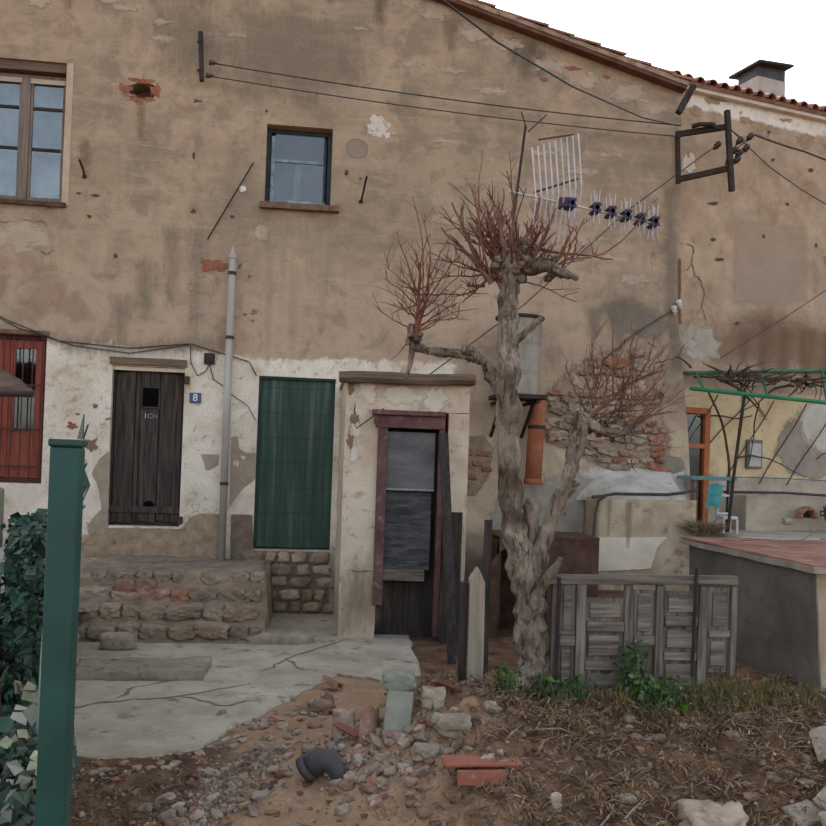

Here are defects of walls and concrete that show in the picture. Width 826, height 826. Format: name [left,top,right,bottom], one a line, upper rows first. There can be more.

spalling [119,78,161,103]
peeling [347,113,396,158]
spalling [200,258,242,272]
crack [681,243,706,319]
peeling [680,321,722,361]
leakage [716,318,826,376]
spalling [544,349,686,533]
spalling [467,435,493,496]
peeling [490,500,502,530]
peeling [521,475,561,527]
peeling [598,537,668,571]